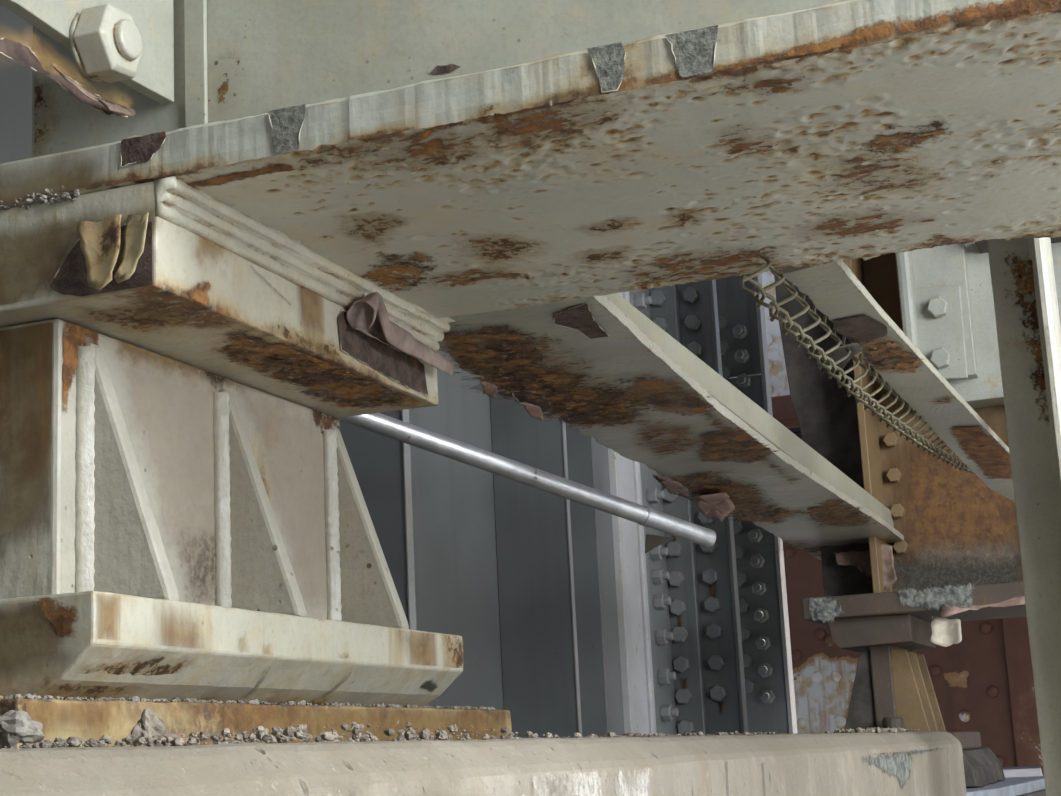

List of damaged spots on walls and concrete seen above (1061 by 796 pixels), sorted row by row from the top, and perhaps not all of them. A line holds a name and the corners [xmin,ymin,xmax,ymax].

rust [708,0,1061,96]
peeling [120,132,166,167]
rust [186,90,619,188]
peeling [50,213,152,297]
rust [63,308,181,412]
peeling [338,292,455,397]
peeling [553,304,609,339]
rust [440,323,876,527]
rust [786,426,1022,592]
peeling [793,652,859,734]
damp [534,772,602,796]
damp [619,768,649,796]